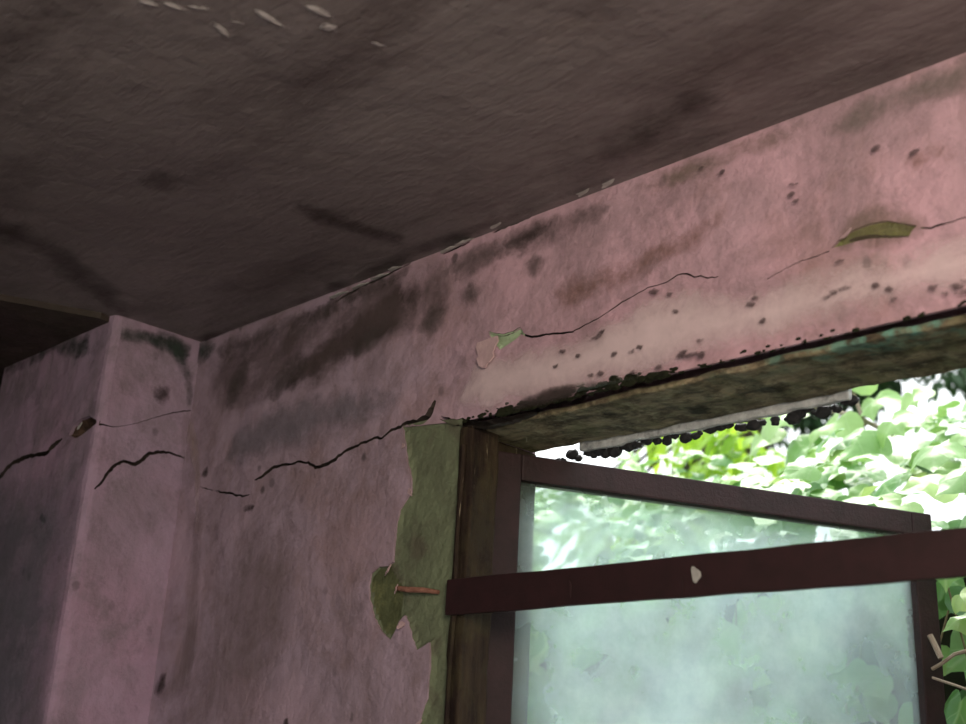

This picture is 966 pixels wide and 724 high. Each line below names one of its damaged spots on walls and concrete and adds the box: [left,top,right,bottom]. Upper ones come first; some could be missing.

flaking render [835,221,924,247]
crack [921,217,966,229]
crack [522,273,718,338]
water stain [220,279,442,400]
flaking render [476,327,525,369]
water stain [677,340,705,358]
water stain [516,371,610,408]
crack [99,410,191,427]
crack [0,438,62,478]
crack [94,450,184,489]
crack [202,400,538,497]
flaking render [370,419,463,724]